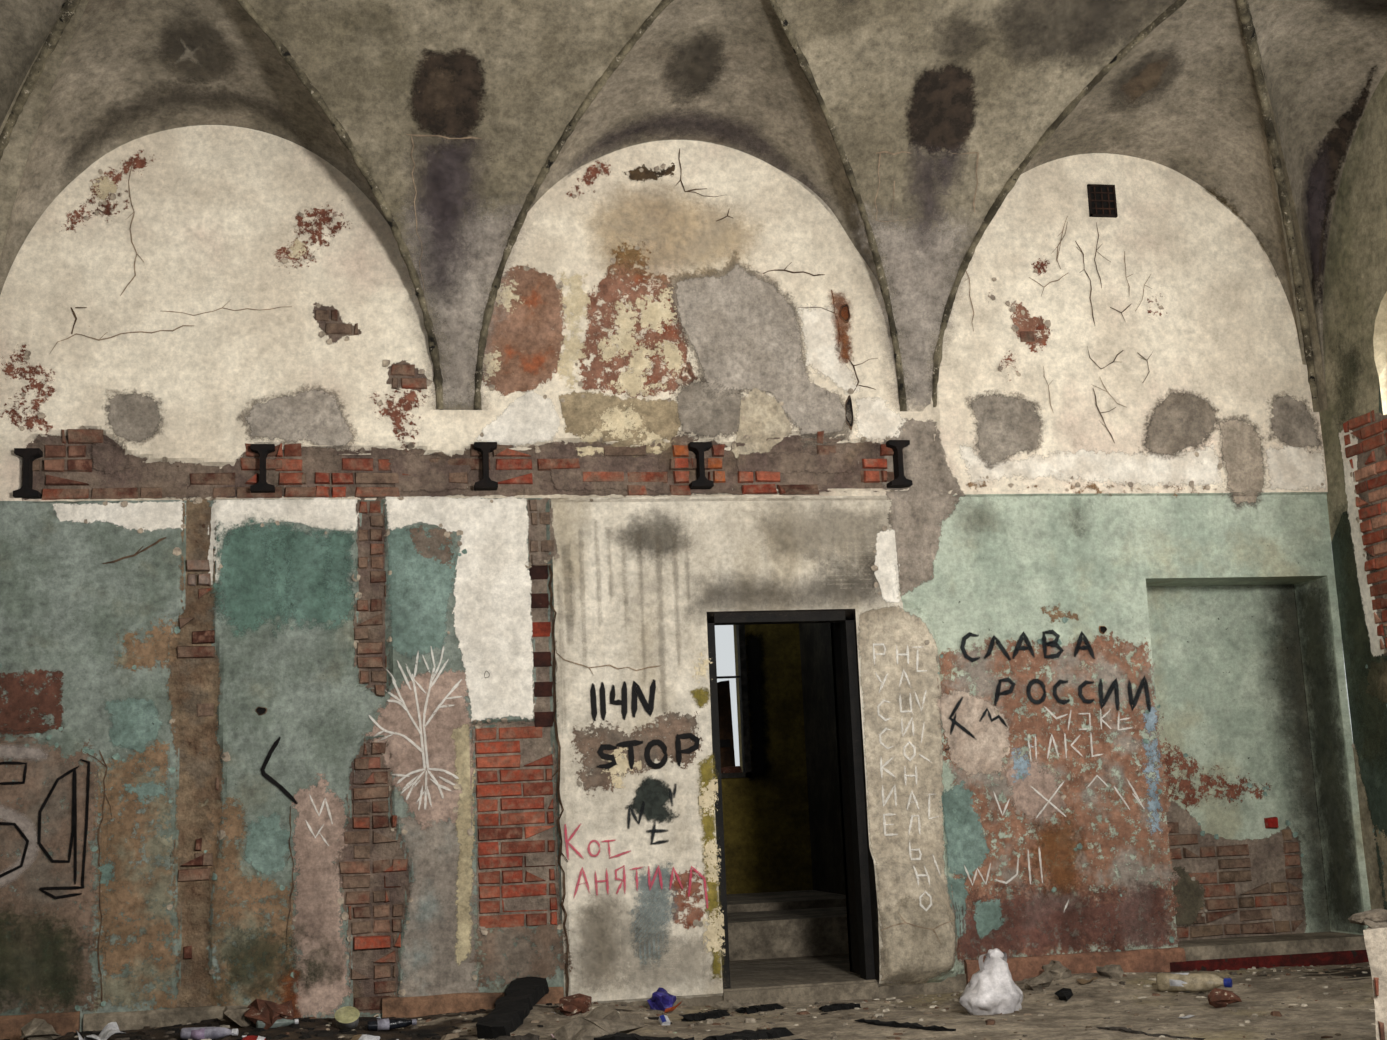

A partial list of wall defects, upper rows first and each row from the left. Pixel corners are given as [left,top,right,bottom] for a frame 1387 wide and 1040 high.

crack [120,163,144,296]
crack [50,304,280,353]
damp [410,48,487,289]
peeling [482,241,698,403]
damp [906,27,977,226]
crack [965,271,974,332]
crack [1029,216,1153,443]
peeling [0,344,904,1017]
peeling [924,604,1307,962]
damp [0,914,80,1009]